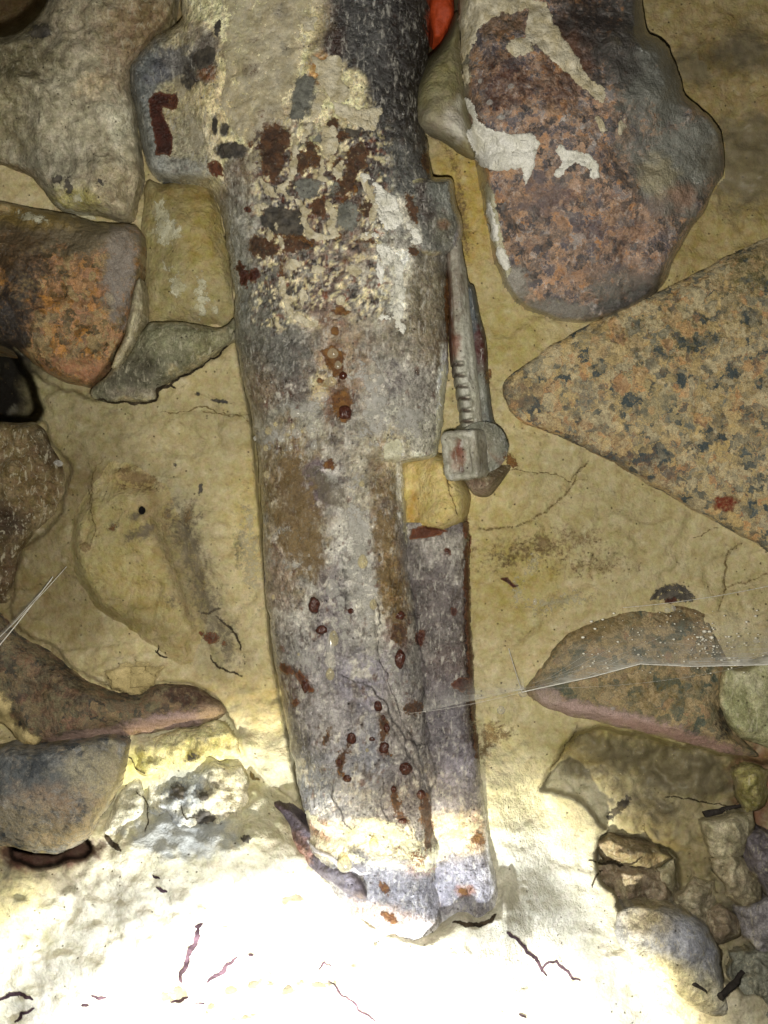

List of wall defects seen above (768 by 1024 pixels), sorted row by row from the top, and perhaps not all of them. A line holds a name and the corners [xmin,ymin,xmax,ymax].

peeling [172,0,383,241]
peeling [266,222,326,327]
rust [317,306,353,423]
rust [409,525,448,540]
crack [480,463,587,531]
rust [443,517,479,759]
rust [335,732,356,782]
rust [369,700,413,775]
rust [403,700,424,715]
rust [391,785,435,868]